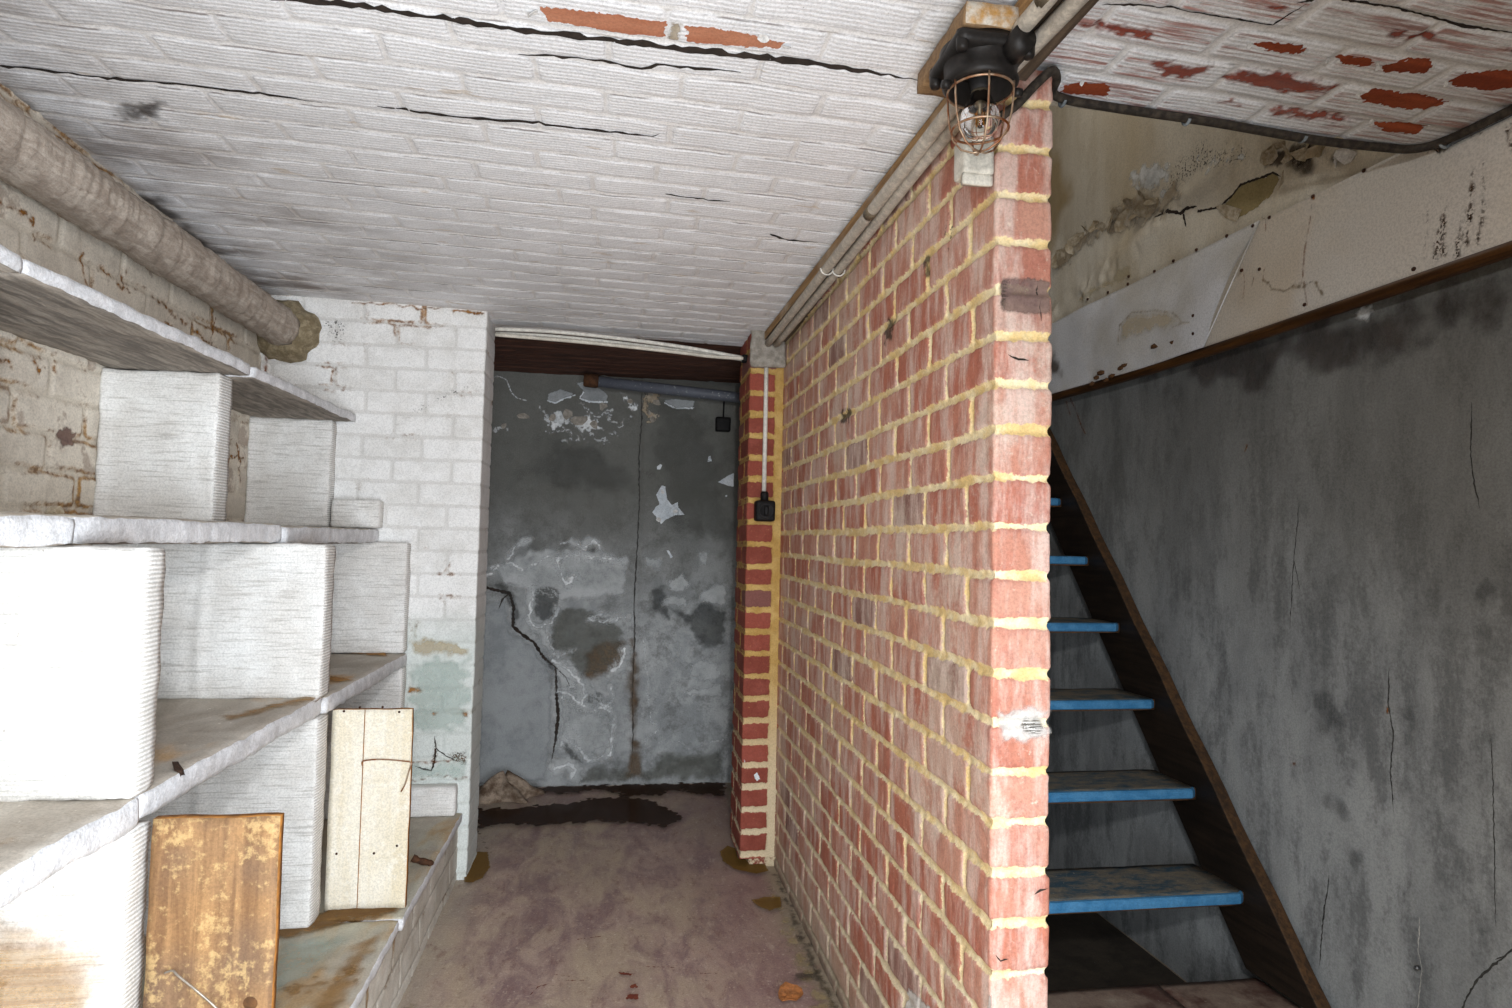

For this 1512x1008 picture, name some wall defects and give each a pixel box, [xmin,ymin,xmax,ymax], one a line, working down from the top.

crack [272,0,916,80]
peeling [1082,20,1153,40]
peeling [1247,42,1307,55]
crack [1104,0,1512,33]
peeling [1060,80,1110,100]
peeling [1152,61,1344,121]
peeling [1325,30,1512,135]
crack [377,106,658,137]
water stain [1130,144,1244,199]
peeling [652,464,684,524]
crack [486,586,570,762]
crack [1462,744,1512,1008]